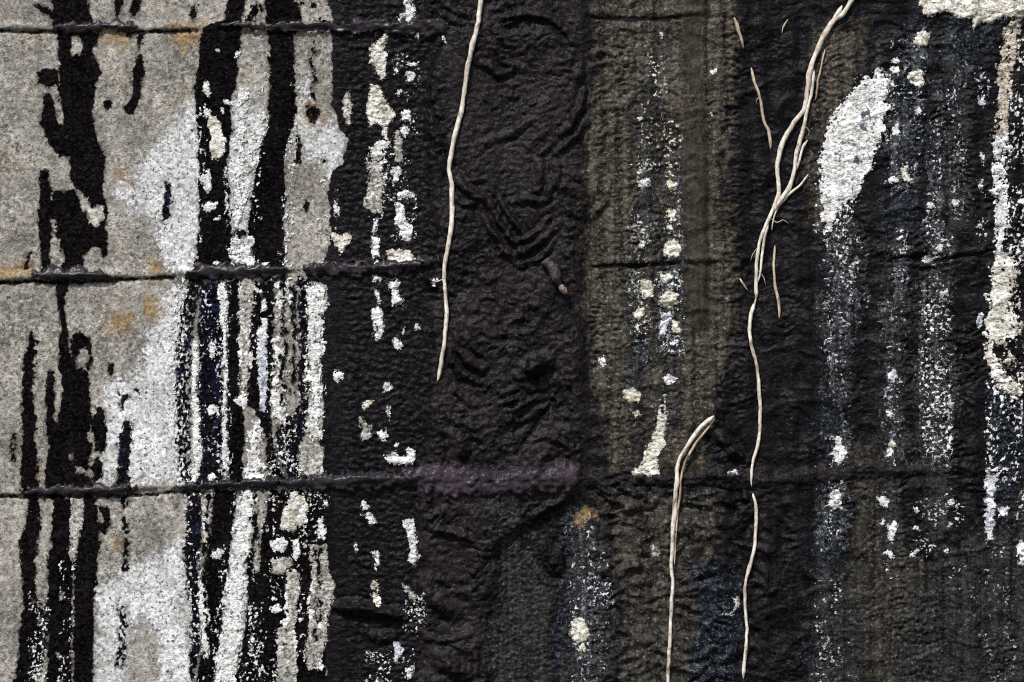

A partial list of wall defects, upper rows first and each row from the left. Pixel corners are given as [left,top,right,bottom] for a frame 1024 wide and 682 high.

peeling [398,0,416,22]
peeling [363,32,421,350]
peeling [813,41,967,472]
peeling [910,0,1024,604]
peeling [812,580,850,682]
peeling [821,481,843,552]